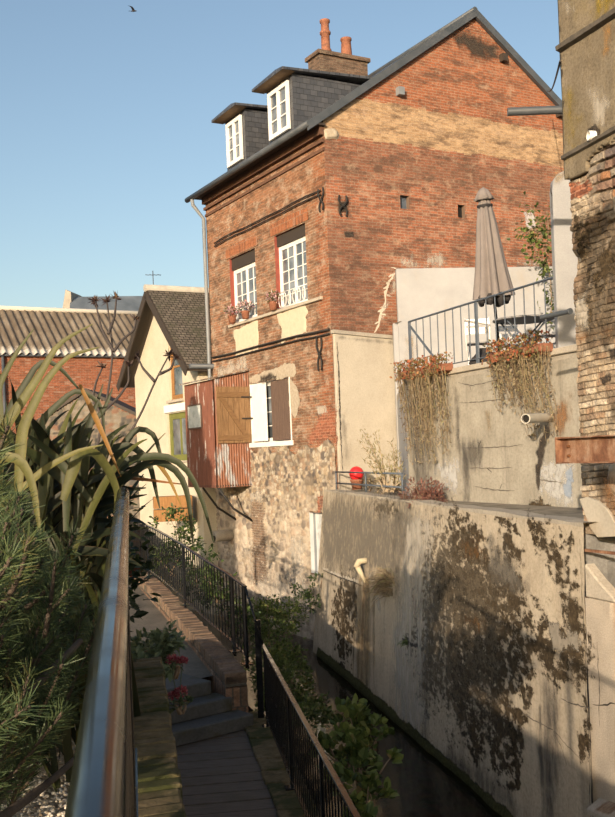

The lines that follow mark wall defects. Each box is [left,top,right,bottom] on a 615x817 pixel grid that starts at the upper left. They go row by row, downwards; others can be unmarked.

spalling [569,180,593,199]
peeling [249,363,300,418]
corrosion [554,403,567,434]
leakage [321,487,433,732]
crack [500,539,615,765]
leakage [470,674,533,792]
leakage [577,695,592,763]